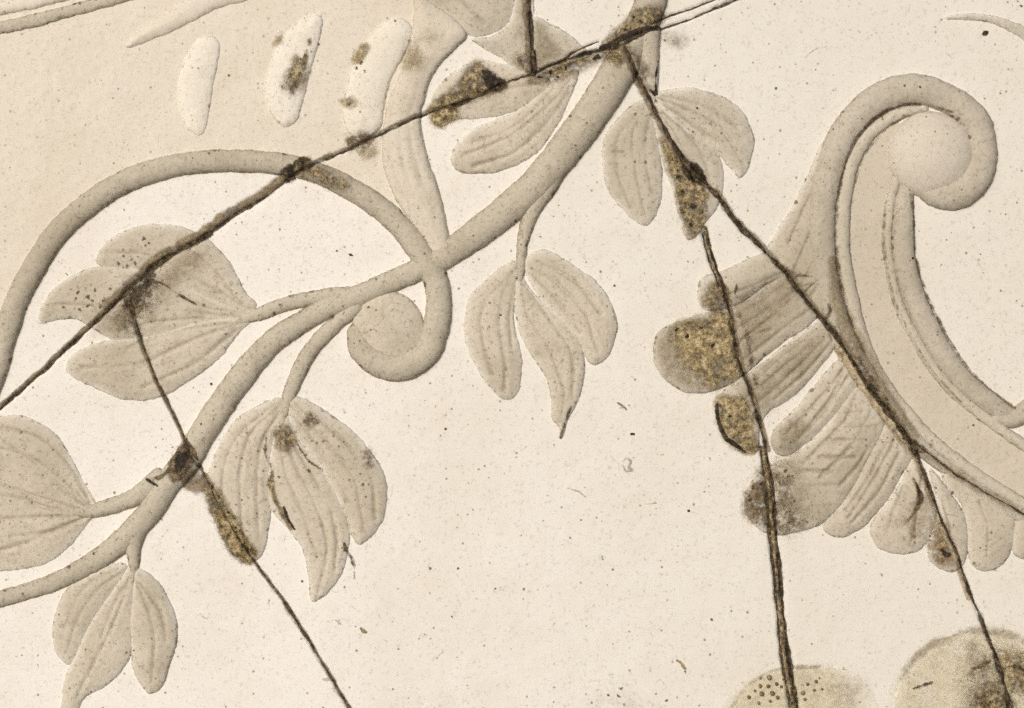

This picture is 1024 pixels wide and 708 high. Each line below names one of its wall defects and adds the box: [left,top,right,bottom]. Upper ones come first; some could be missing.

crack [126,298,351,708]
crack [0,0,737,410]
crack [622,46,1024,708]